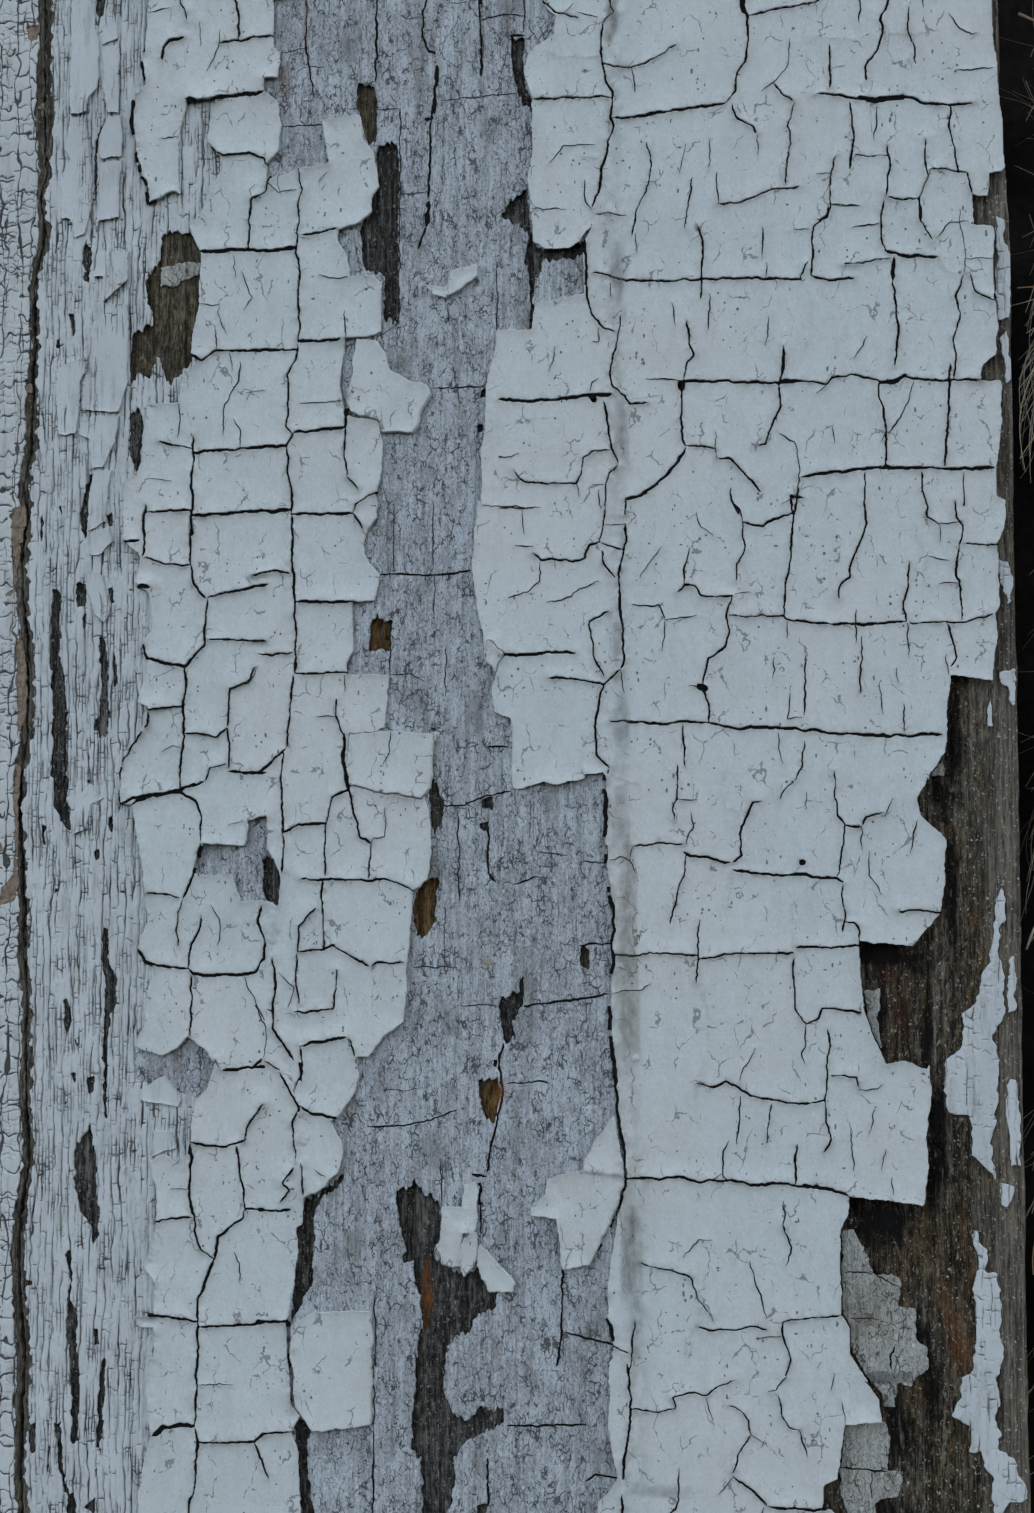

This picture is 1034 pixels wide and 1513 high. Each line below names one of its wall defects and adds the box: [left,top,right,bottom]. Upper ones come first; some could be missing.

peeling [0,0,130,1513]
crack [0,0,511,1513]
peeling [120,0,894,1513]
crack [506,1421,586,1429]
crack [367,0,998,1266]
crack [556,1239,899,1513]
peeling [472,0,1031,1513]